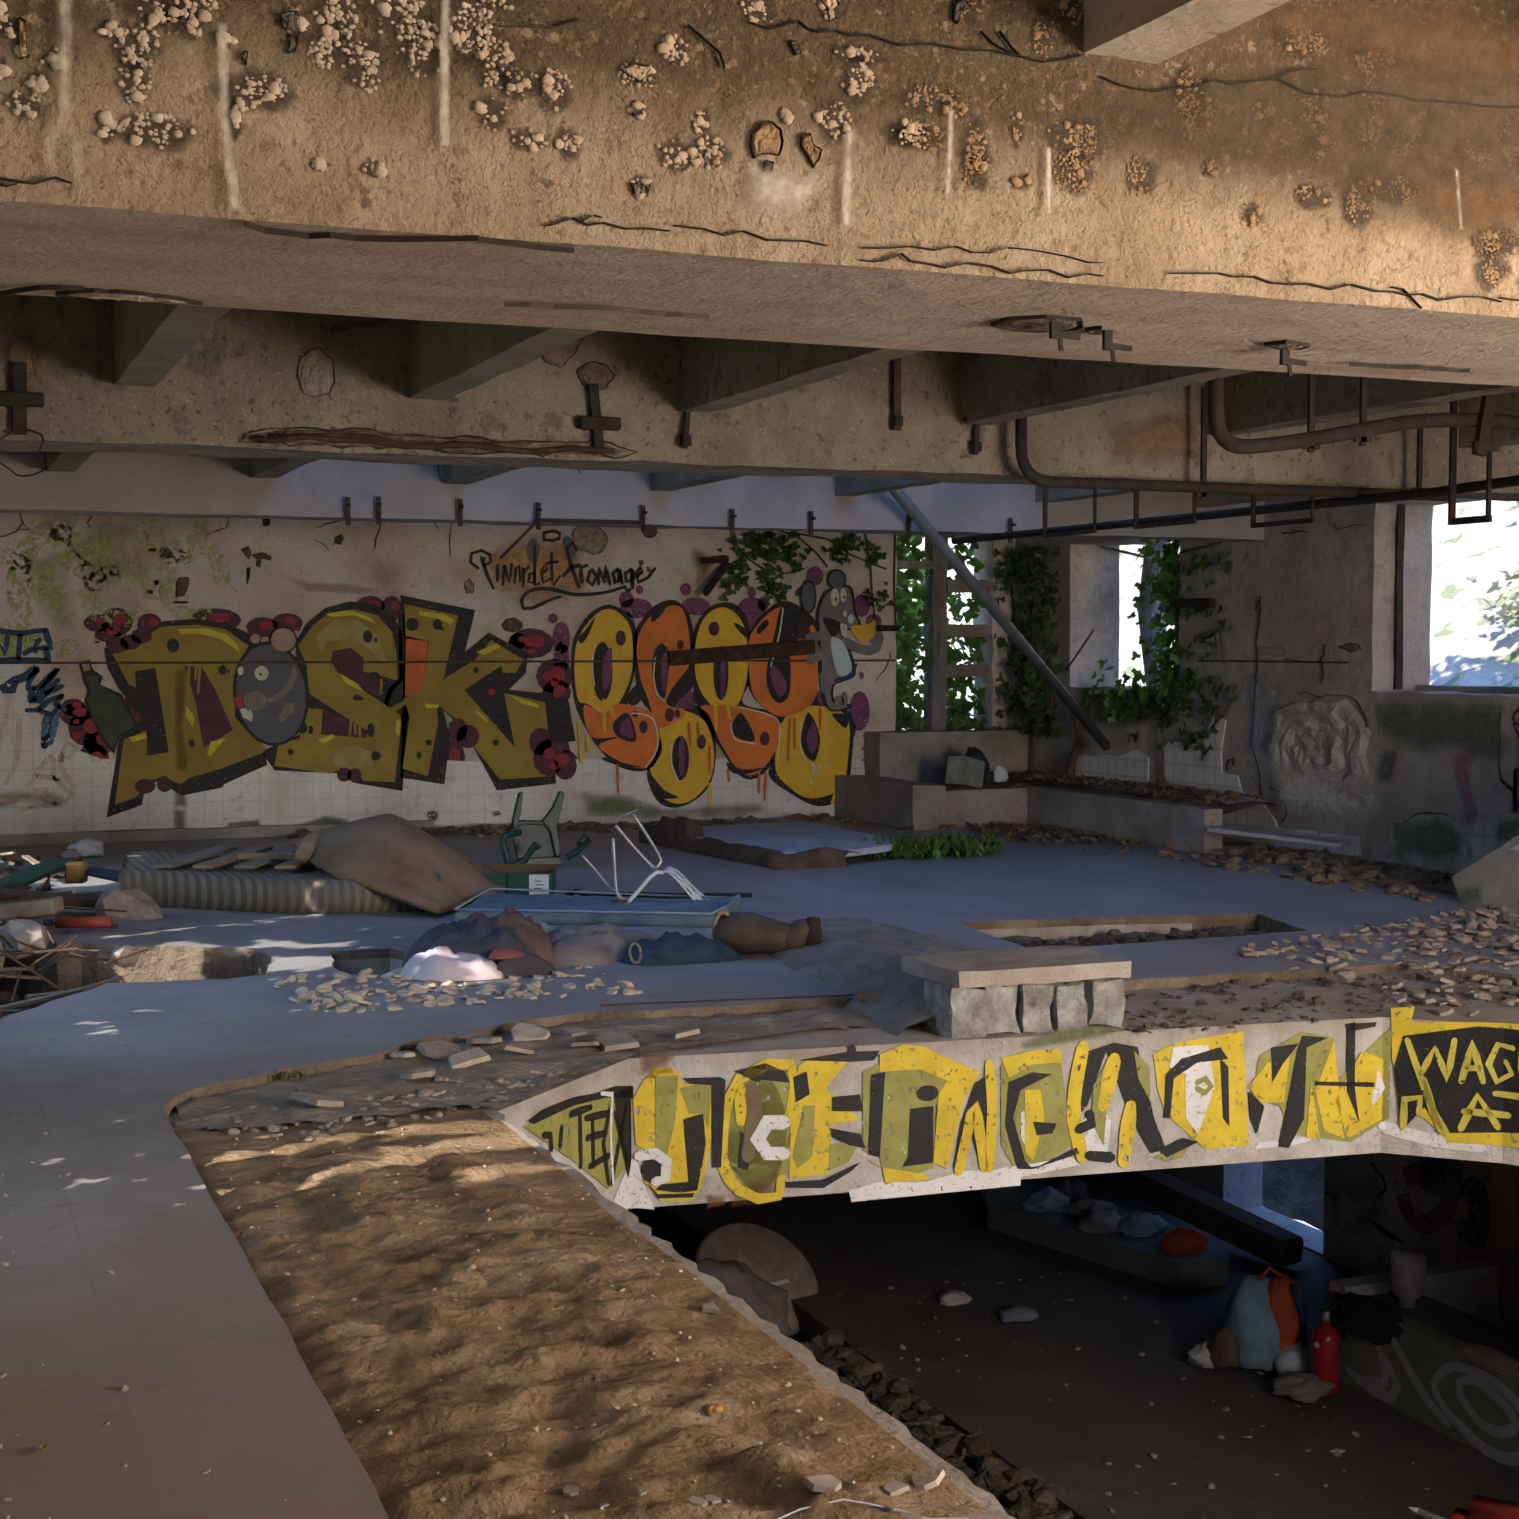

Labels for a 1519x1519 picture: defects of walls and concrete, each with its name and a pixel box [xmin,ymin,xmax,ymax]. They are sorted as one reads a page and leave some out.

damp [441,0,449,145]
crack [687,24,726,69]
crack [749,20,1519,108]
damp [219,26,238,207]
damp [1135,54,1519,212]
crack [0,176,72,187]
damp [755,174,813,204]
damp [843,132,853,225]
crack [245,214,1104,278]
crack [1168,272,1519,309]
spalling [242,426,637,459]